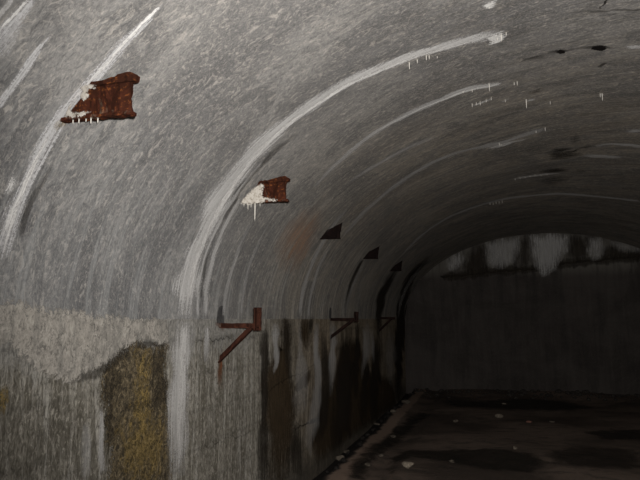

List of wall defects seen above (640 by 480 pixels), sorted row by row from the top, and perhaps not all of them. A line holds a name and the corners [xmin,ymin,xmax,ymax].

damp [168,31,507,435]
damp [258,257,430,480]